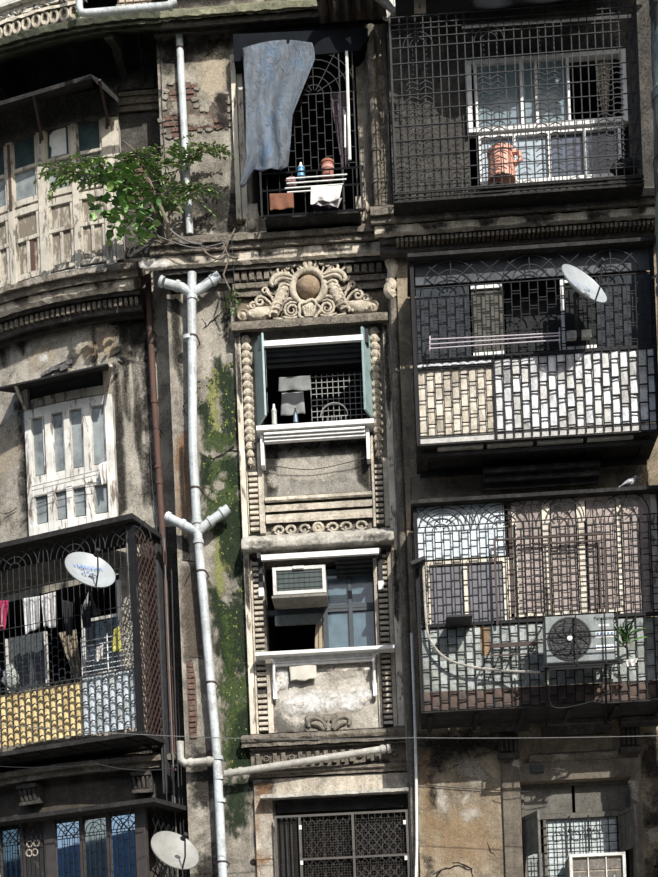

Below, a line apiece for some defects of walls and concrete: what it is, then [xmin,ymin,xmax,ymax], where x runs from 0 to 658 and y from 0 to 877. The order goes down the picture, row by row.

flaking render [157,51,233,159]
damp [110,311,156,516]
damp [170,290,183,382]
damp [197,288,242,453]
damp [640,732,658,829]
crack [434,862,473,877]